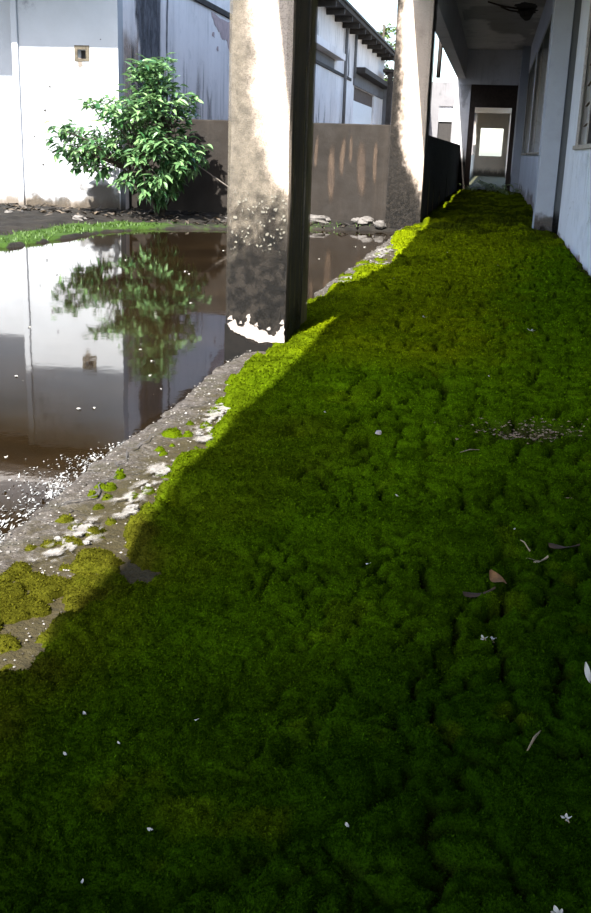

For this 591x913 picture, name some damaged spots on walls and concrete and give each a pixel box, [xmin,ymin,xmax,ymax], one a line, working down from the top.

leakage [224,0,301,361]
leakage [328,137,377,195]
leakage [385,0,422,229]
spalling [227,314,285,343]